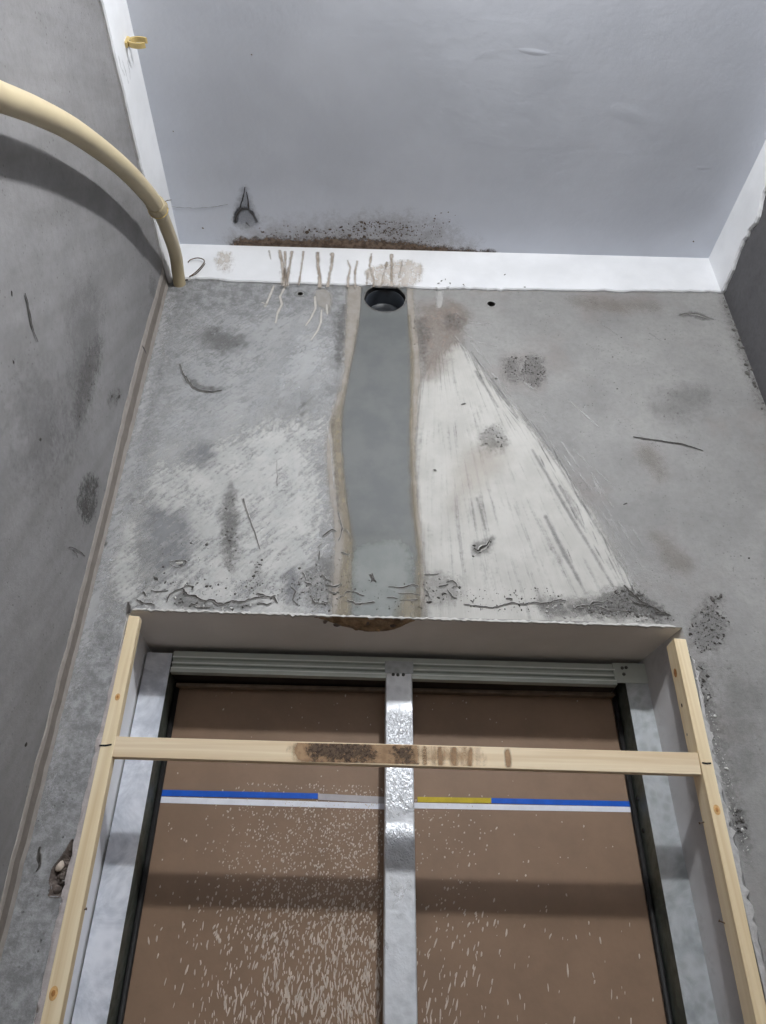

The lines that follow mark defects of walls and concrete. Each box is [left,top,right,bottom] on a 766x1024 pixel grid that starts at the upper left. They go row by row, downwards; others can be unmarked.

leakage [68,212,657,695]
crack [633,436,703,451]
crack [126,512,671,616]
flaking render [133,498,676,632]
flaking render [689,594,752,862]
spalling [36,840,74,898]